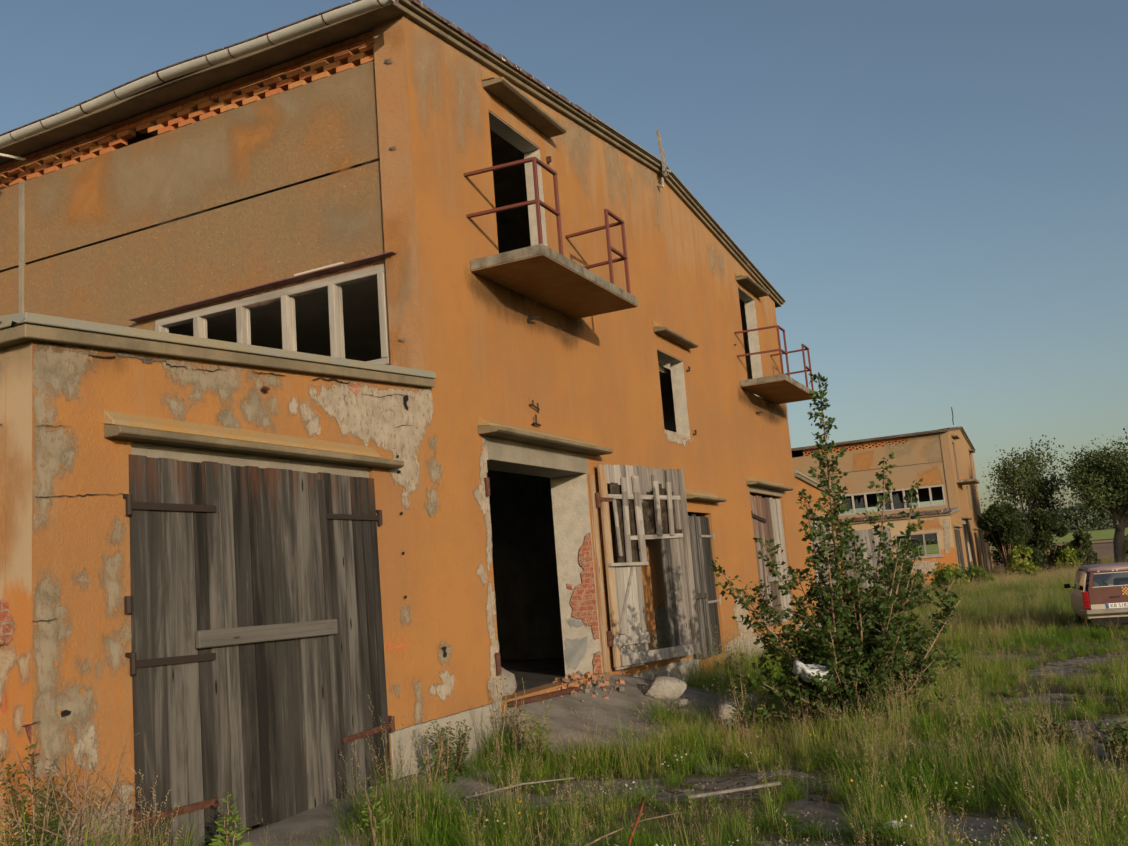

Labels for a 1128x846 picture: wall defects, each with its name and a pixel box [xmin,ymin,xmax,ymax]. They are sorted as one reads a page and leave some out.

peeling [33,346,96,530]
peeling [116,352,442,515]
peeling [0,574,98,778]
peeling [73,520,132,676]
peeling [414,643,455,724]
peeling [474,443,502,704]
flaking render [567,532,599,639]
flaking render [592,654,602,674]
peeling [50,784,135,846]